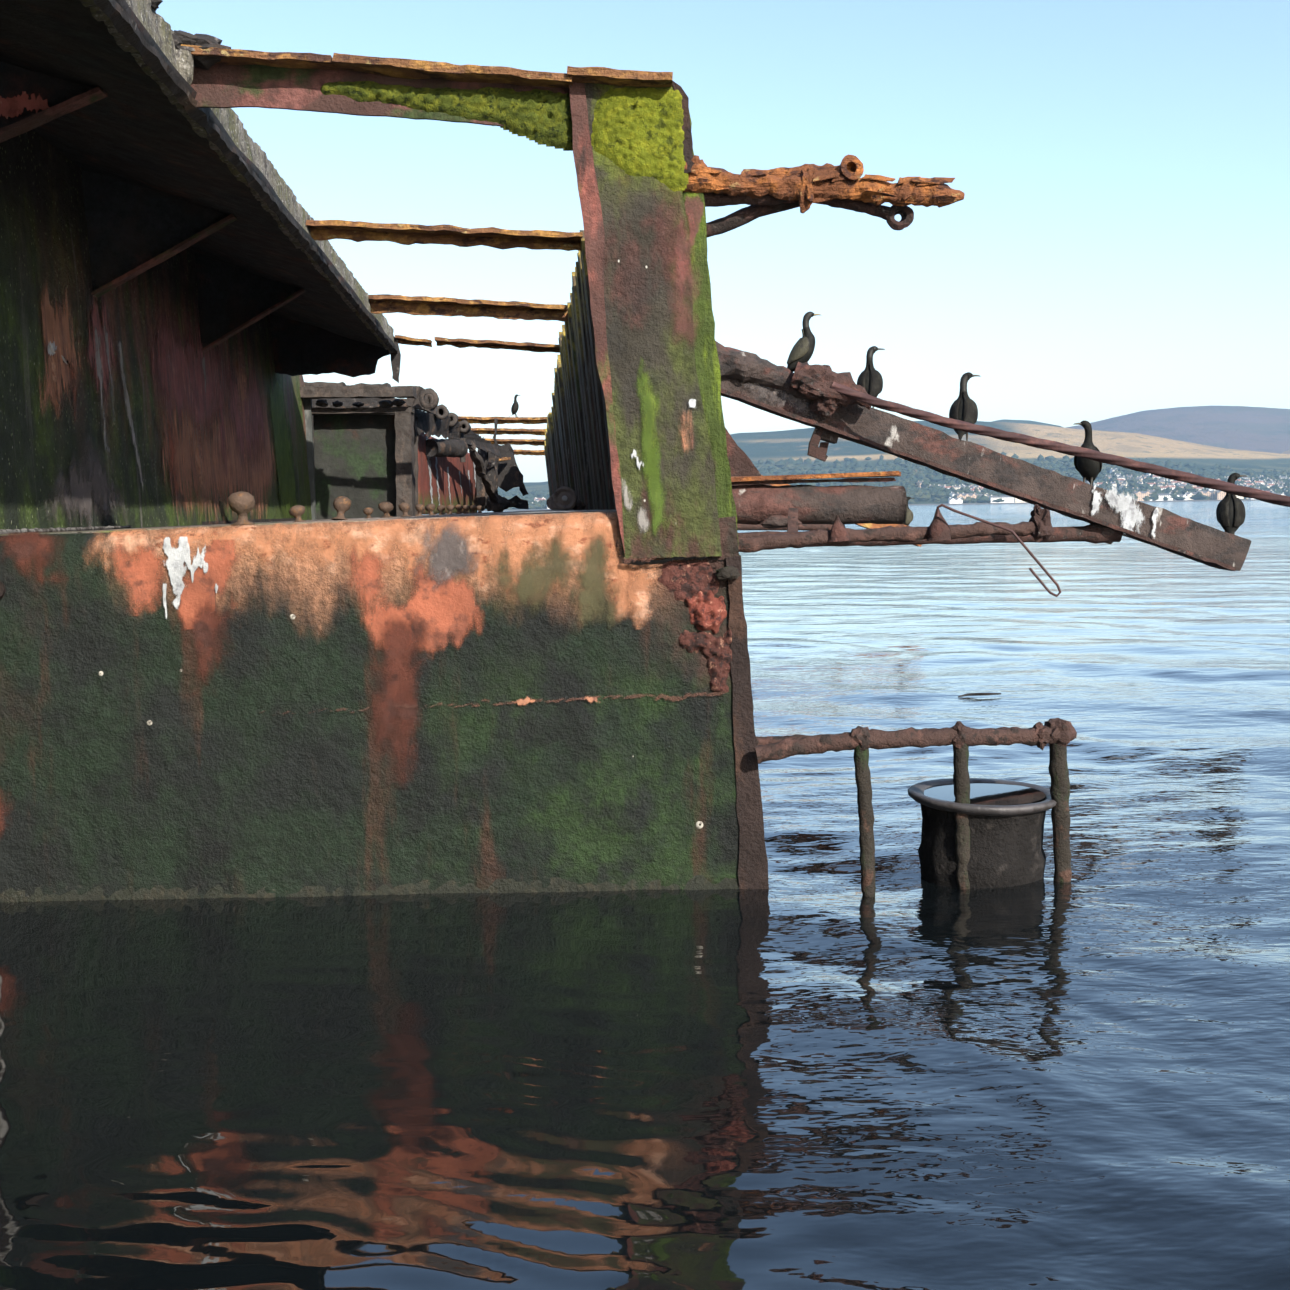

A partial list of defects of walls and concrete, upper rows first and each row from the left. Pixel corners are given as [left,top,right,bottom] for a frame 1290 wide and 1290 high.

rust [37,277,116,417]
rust [96,348,654,759]
crack [336,692,726,713]